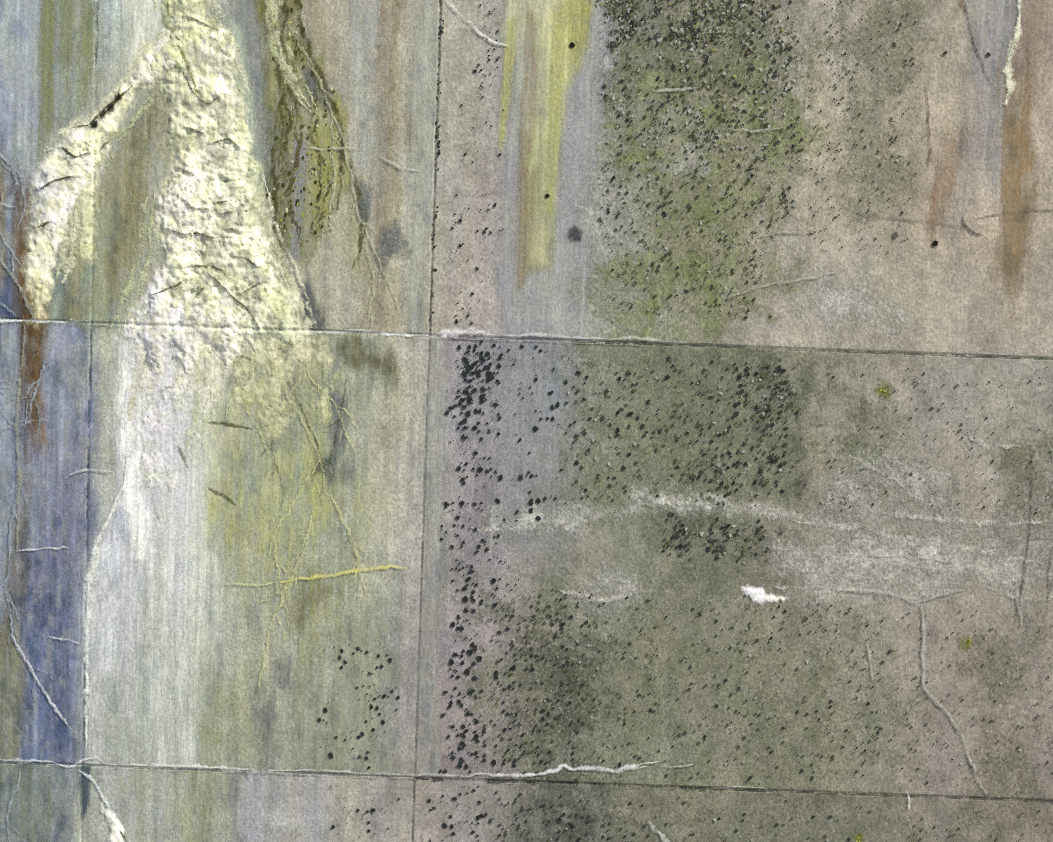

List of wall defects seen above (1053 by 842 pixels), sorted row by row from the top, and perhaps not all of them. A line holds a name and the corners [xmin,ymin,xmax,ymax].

rust [0,171,46,446]
crack [0,154,88,725]
leakage [0,0,345,842]
crack [225,337,407,685]
leakage [359,186,370,220]
crack [446,0,508,46]
crack [288,24,687,344]
leakage [499,0,603,469]
crack [656,86,696,94]
spalling [472,449,1053,618]
rust [999,0,1040,283]
crack [2,756,694,842]